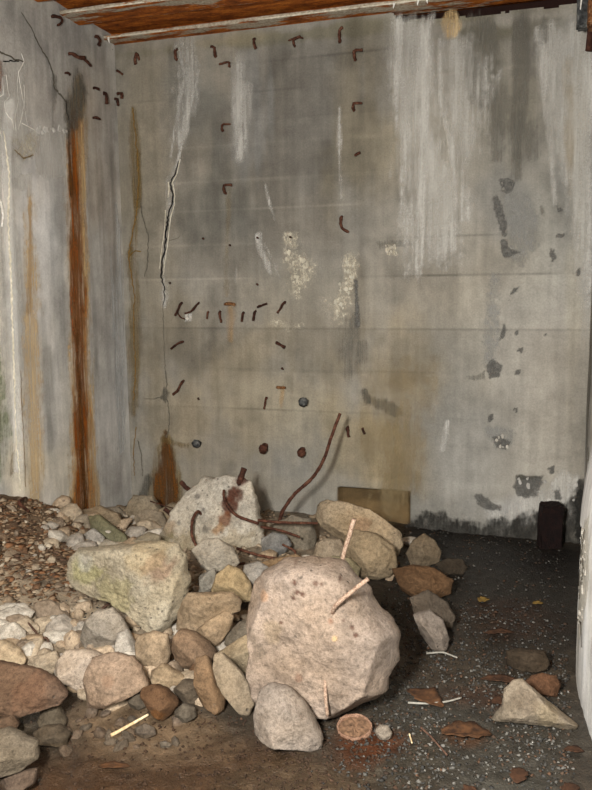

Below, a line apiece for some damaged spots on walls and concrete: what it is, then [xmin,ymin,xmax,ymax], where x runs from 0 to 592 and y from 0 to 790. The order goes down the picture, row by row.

water stain [404,23,455,230]
rust [66,76,100,509]
crack [128,108,180,438]
spalling [483,355,501,378]
crack [133,427,143,476]
rust [139,436,181,506]
water stain [408,502,538,540]
spalling [475,494,501,510]
spalling [487,414,510,449]
spalling [513,466,578,503]
water stain [554,477,584,544]